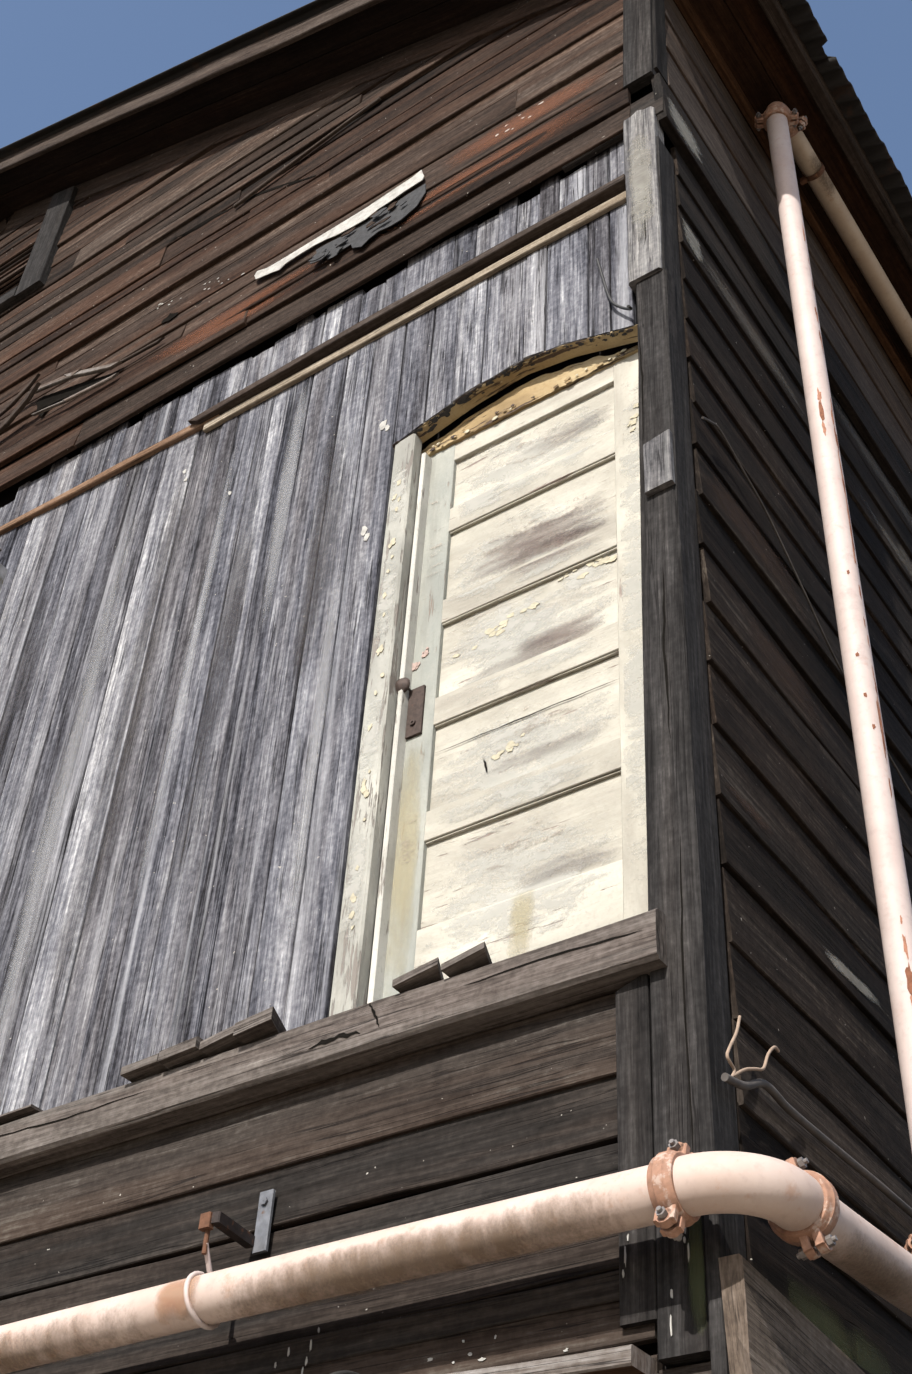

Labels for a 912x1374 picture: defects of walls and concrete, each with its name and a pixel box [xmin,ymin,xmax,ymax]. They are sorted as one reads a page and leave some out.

peeling [254,170,426,280]